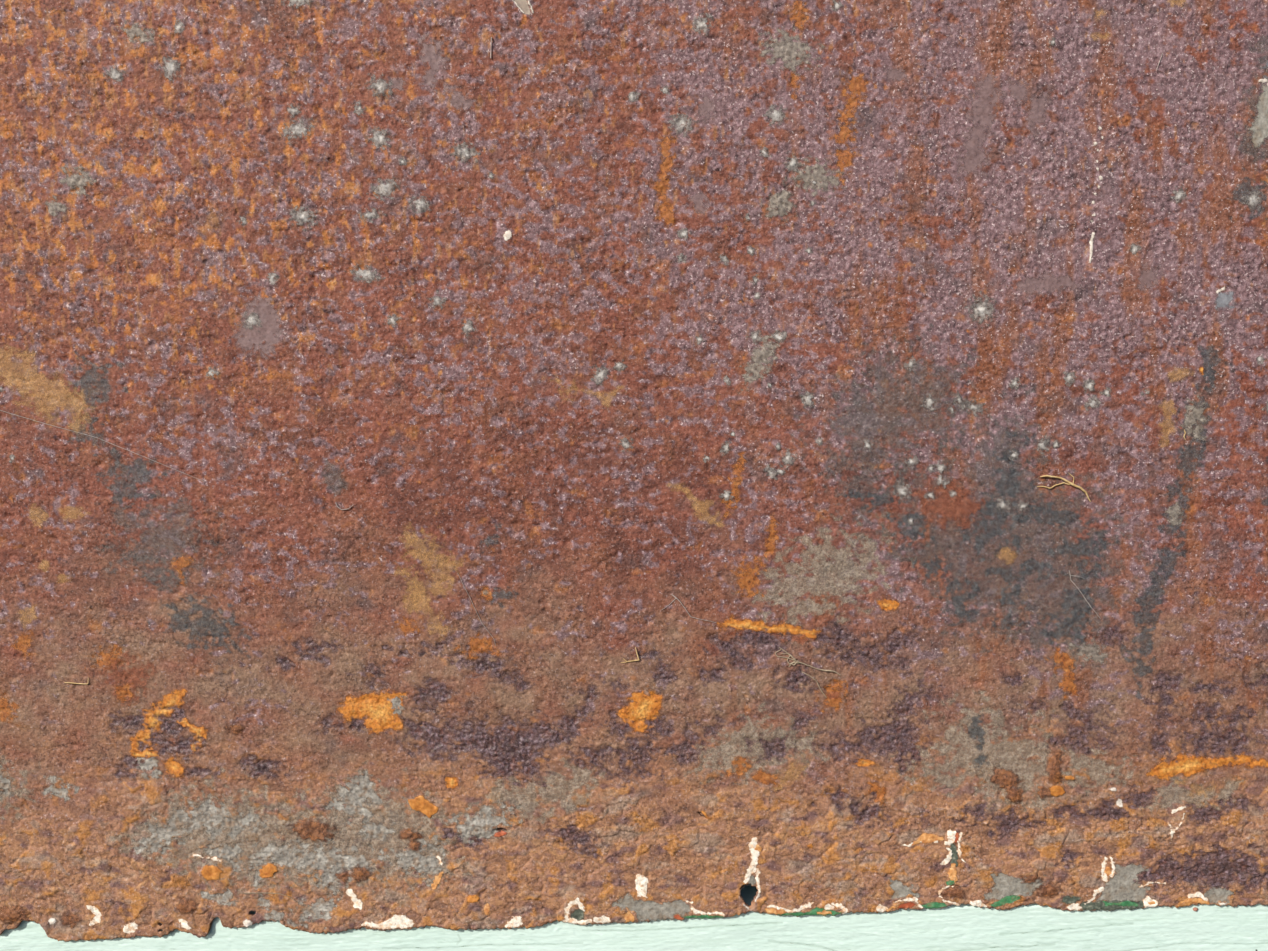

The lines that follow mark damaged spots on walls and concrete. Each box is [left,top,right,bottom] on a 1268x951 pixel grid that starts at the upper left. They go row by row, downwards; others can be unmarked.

rust [726,452,746,509]
rust [921,482,980,529]
rust [1146,735,1268,780]
rust [61,910,81,929]
peeling [86,905,102,926]
rust [176,897,196,913]
peeling [563,874,725,925]
peeling [743,837,762,893]
peeling [765,902,848,916]
spalling [876,784,1155,913]
spalling [1062,843,1268,911]
rust [1140,872,1268,908]